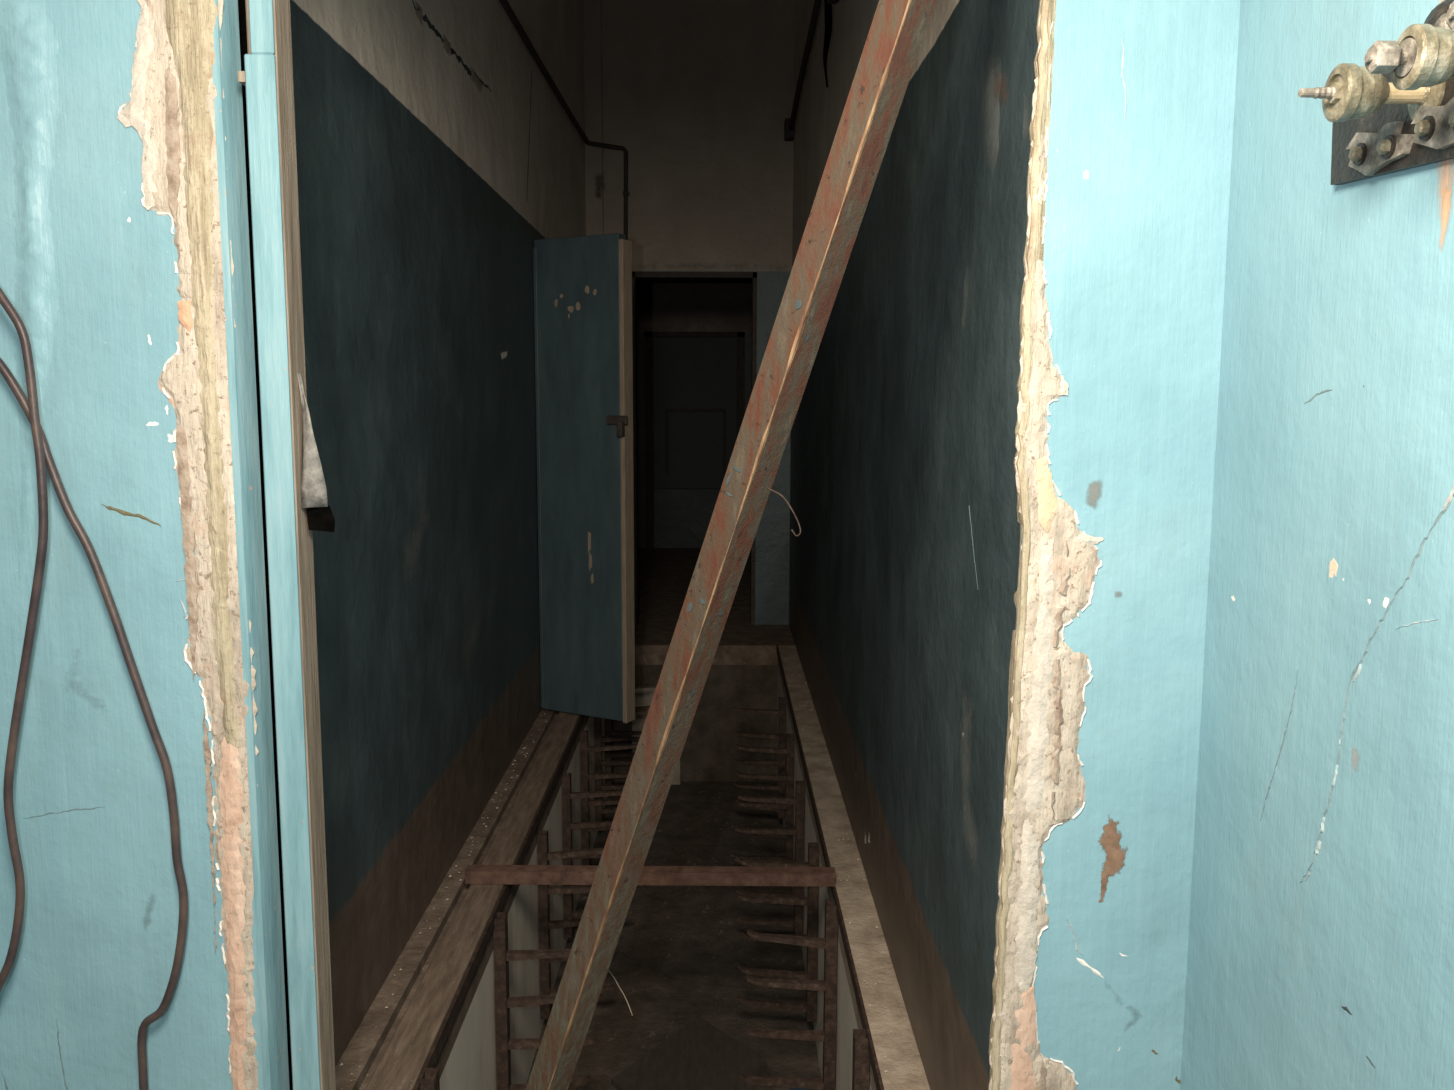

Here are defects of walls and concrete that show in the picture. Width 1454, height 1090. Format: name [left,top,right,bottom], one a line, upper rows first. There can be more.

corrosion [1440,159,1451,243]
spalling [117,0,259,1090]
spalling [988,0,1104,1090]
corrosion [1099,817,1128,903]
crack [1301,486,1454,882]